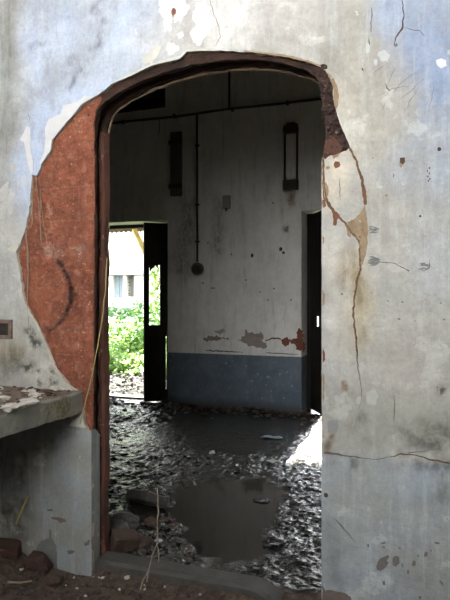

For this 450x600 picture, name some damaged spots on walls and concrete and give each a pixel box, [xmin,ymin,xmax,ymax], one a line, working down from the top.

peeling [113,0,219,83]
crack [394,0,424,47]
flaking render [7,91,102,429]
crack [322,148,368,408]
peeling [203,329,229,342]
peeling [239,328,306,352]
flaking render [0,392,41,412]
crack [324,449,450,464]